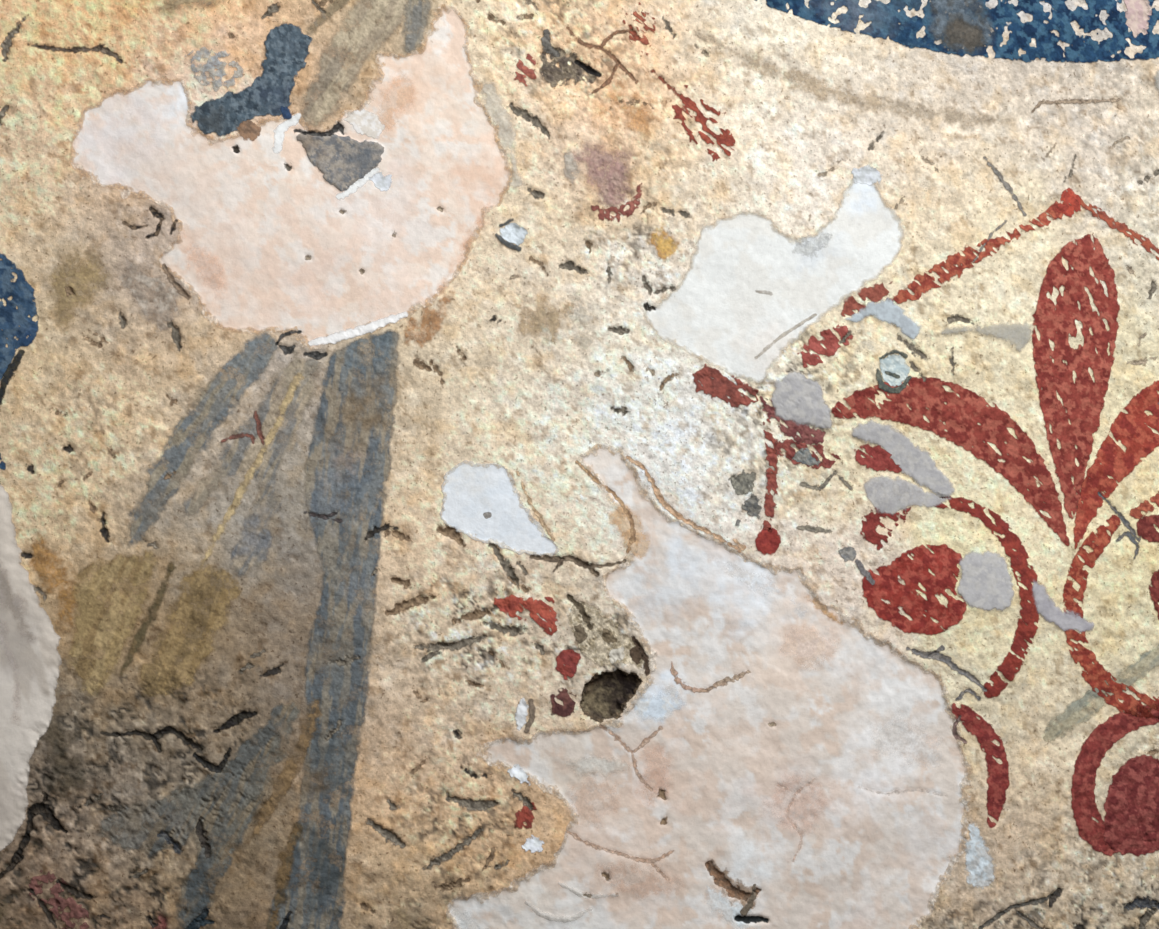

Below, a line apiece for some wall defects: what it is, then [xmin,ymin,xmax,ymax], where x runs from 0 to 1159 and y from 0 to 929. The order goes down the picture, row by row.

spalling [261,3,280,19]
flaking render [71,6,550,351]
flaking render [495,219,588,277]
flaking render [641,165,904,469]
spalling [621,356,679,390]
spalling [415,609,526,667]
flaking render [434,443,994,929]
crack [100,711,257,773]
crack [0,794,96,928]
spalling [423,827,484,870]